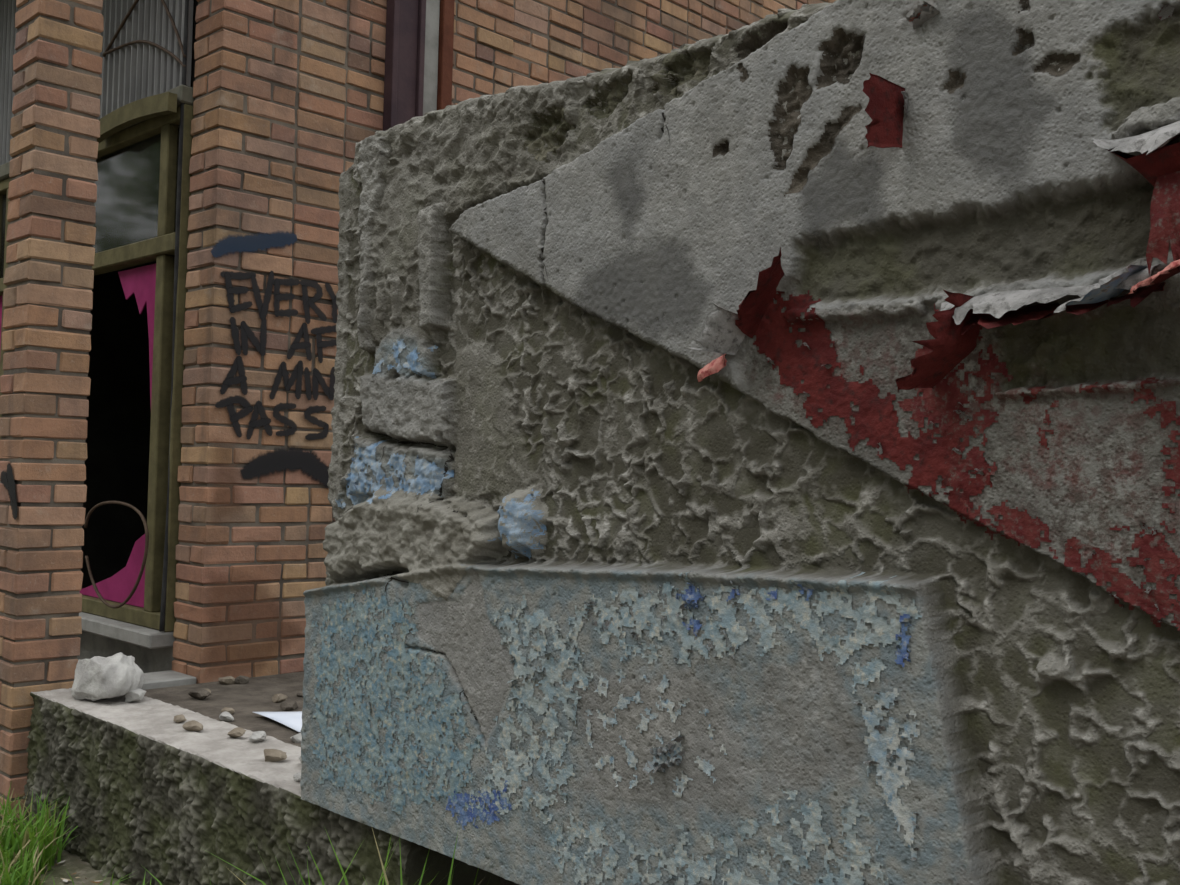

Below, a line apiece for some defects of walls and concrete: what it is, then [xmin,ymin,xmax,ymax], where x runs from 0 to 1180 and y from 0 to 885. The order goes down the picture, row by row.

peeling [768,28,909,196]
spalling [943,70,967,94]
peeling [691,121,1180,632]
crack [371,432,467,517]
peeling [309,571,922,885]